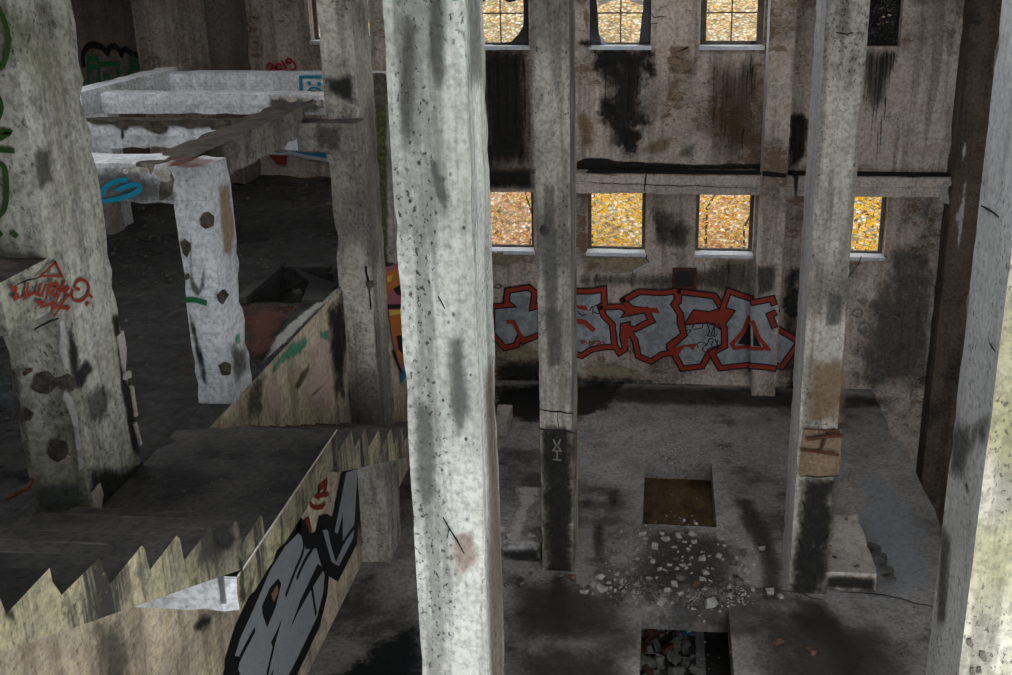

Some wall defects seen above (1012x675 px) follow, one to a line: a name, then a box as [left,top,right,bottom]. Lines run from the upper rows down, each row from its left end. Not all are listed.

water stain [865,53,895,158]
water stain [486,188,560,675]